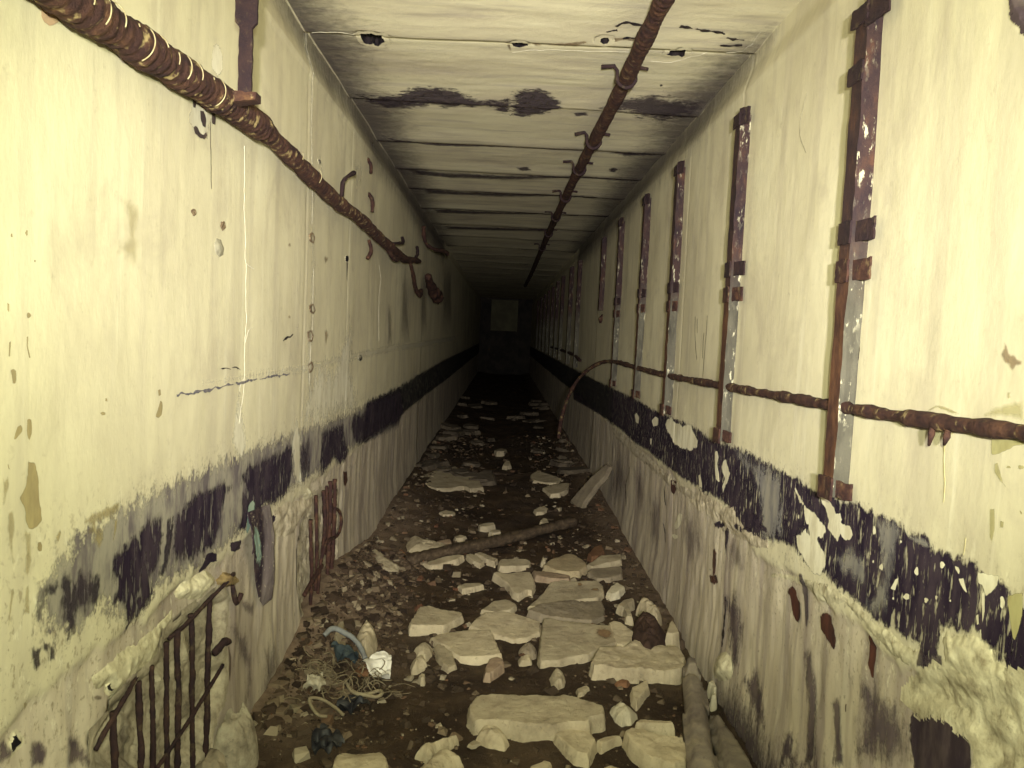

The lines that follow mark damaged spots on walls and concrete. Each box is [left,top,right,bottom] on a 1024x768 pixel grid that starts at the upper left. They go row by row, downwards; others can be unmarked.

leakage [366,86,561,117]
leakage [617,85,687,121]
corrosion [927,427,951,446]
flaking render [20,462,42,529]
leakage [739,450,784,542]
spalling [88,572,244,768]
corrosion [788,586,800,622]
corrosion [820,612,836,649]
corrosion [868,635,877,678]
leakage [717,653,817,768]
leakage [833,699,842,763]
spalling [900,655,1024,768]